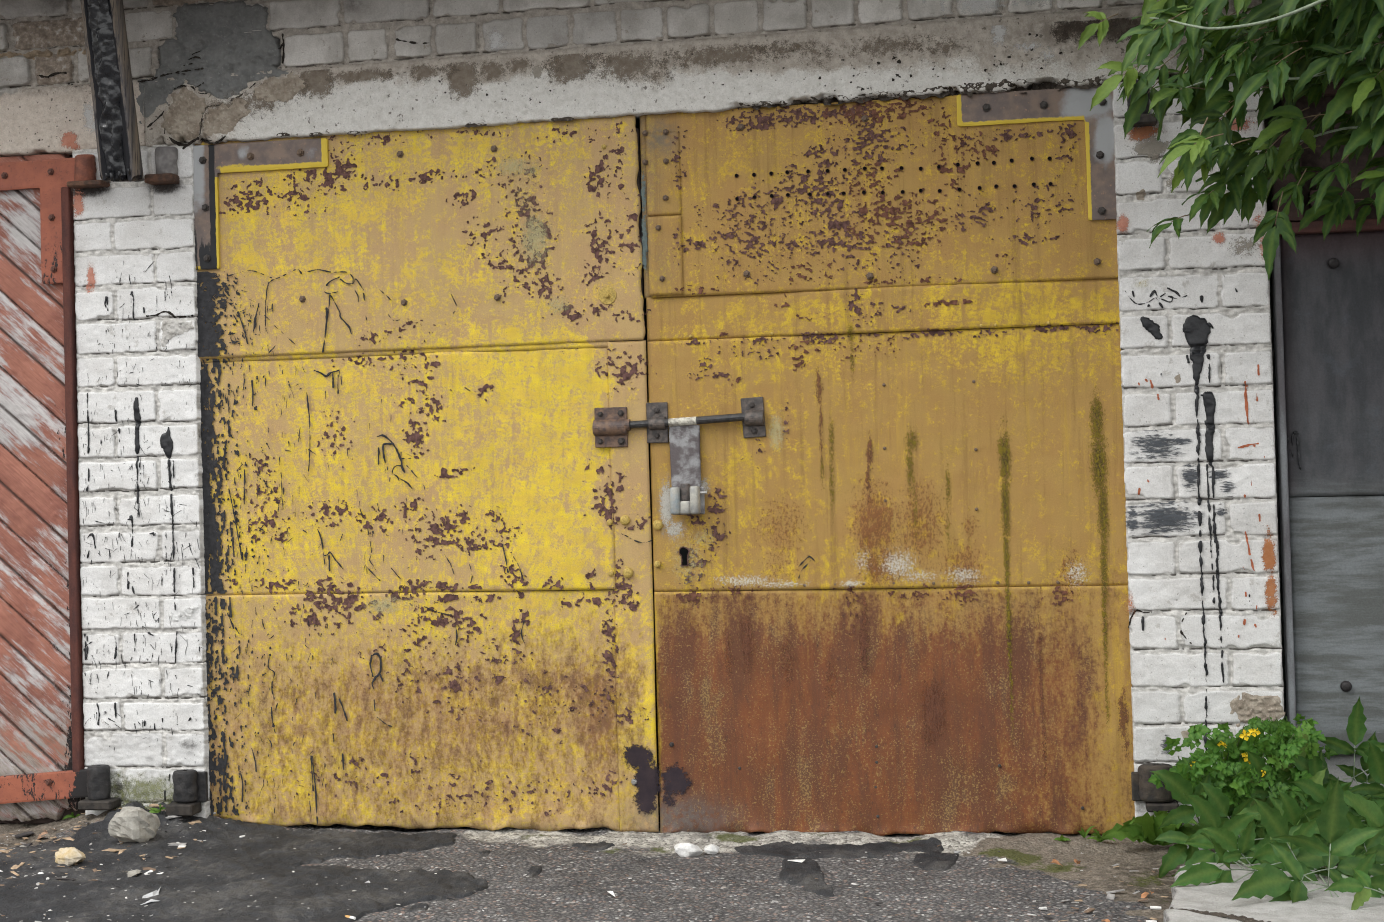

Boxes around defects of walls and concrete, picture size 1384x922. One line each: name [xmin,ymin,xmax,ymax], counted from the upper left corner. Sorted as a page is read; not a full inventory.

spalling [161,72,305,142]
water stain [199,29,963,131]
peeling [219,117,651,325]
peeling [671,45,1119,386]
peeling [317,411,355,468]
peeling [331,320,452,459]
peeling [595,348,657,395]
peeling [225,451,652,745]
rust [845,478,987,674]
peeling [290,753,628,821]